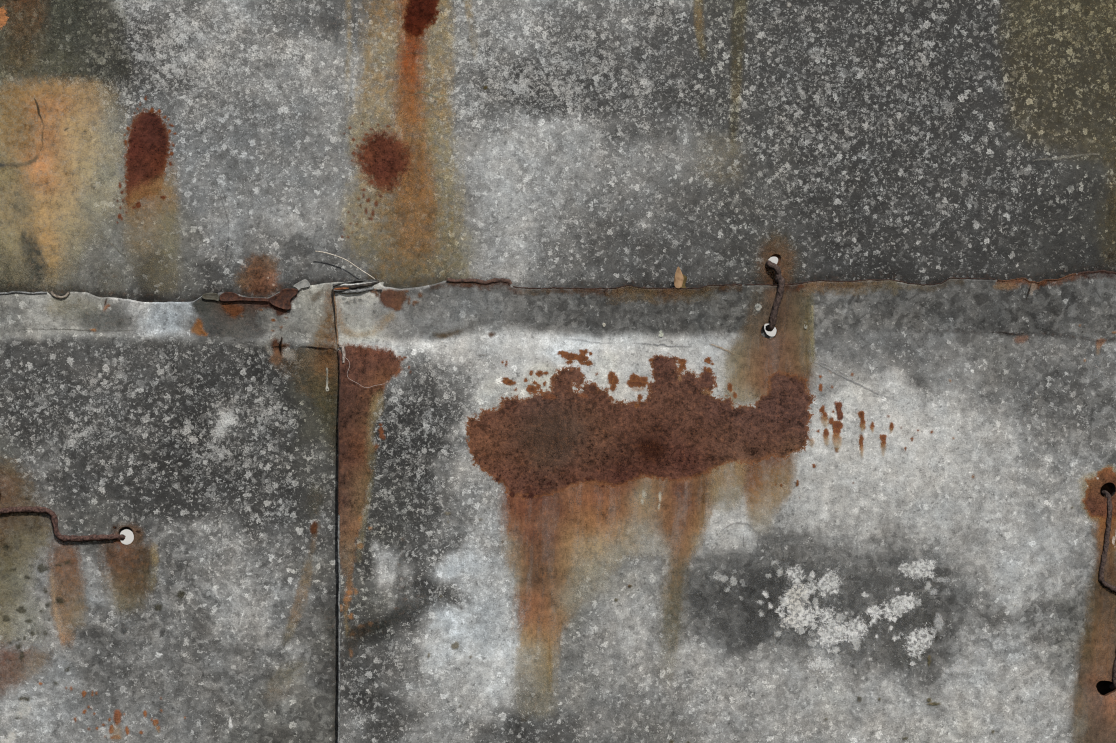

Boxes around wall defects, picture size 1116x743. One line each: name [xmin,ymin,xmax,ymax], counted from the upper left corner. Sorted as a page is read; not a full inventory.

rust [117,97,176,223]
rust [344,0,440,270]
rust [300,281,741,635]
rust [465,242,933,675]
rust [0,650,44,690]
rust [0,463,83,641]
rust [66,687,162,739]
rust [102,526,156,608]
rust [1073,466,1116,743]